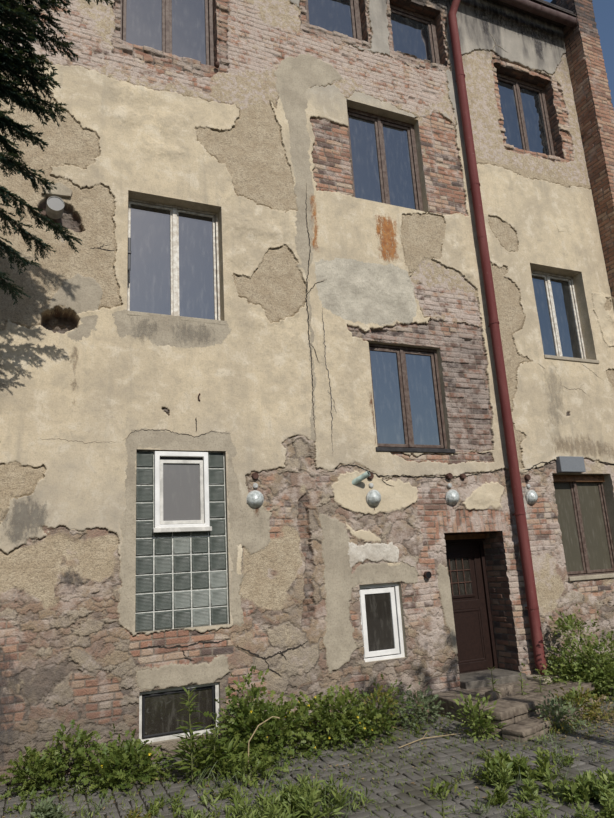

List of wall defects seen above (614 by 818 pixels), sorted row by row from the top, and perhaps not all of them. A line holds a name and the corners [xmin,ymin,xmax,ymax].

flaking render [0,72,124,334]
flaking render [26,0,497,465]
corrosion [377,217,398,260]
crack [305,183,499,487]
flaking render [486,212,519,252]
leakage [474,5,556,58]
flaking render [461,48,591,190]
flaking render [490,258,614,670]
crack [139,639,307,677]
flaking render [0,435,538,786]